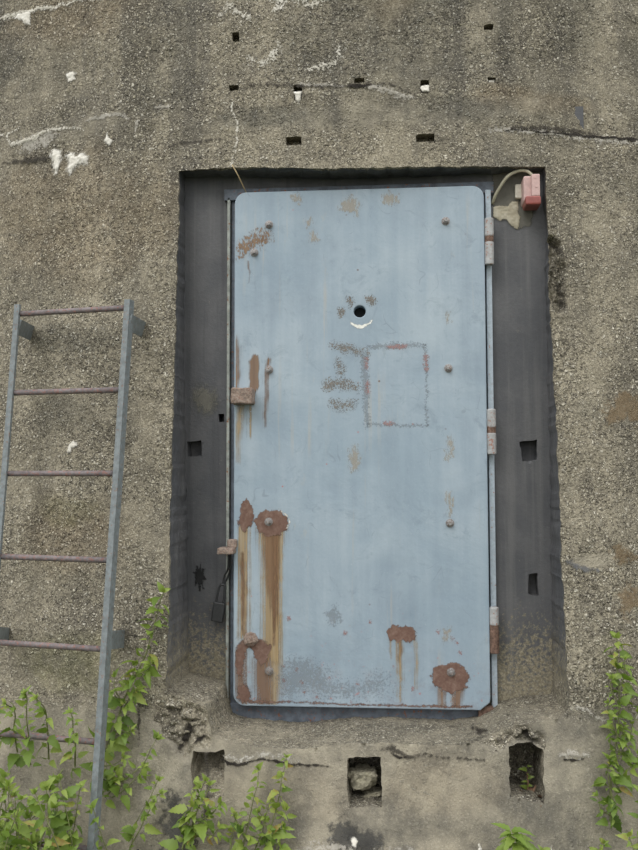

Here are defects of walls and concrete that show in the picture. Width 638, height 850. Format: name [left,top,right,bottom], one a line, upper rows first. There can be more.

crack [0,0,99,25]
crack [490,124,638,144]
leakage [49,149,89,174]
rust [237,228,272,269]
spalling [548,237,567,315]
rust [249,354,269,393]
rust [235,498,472,708]
spalling [153,700,213,758]
crack [203,752,329,821]